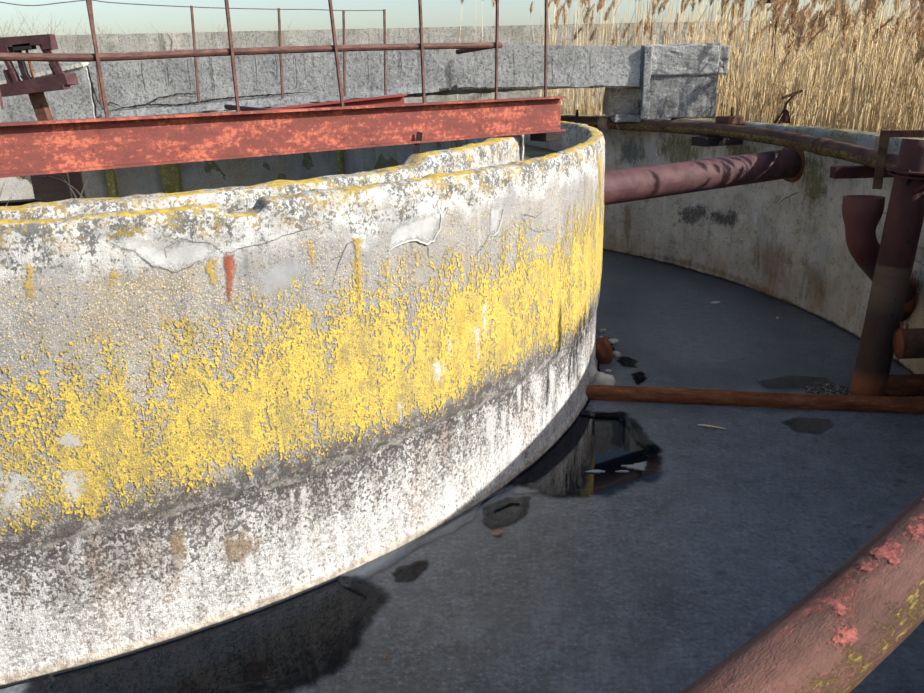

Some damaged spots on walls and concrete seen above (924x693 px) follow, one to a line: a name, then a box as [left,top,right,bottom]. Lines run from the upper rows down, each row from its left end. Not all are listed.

leakage [677,203,738,226]
crack [106,222,329,273]
rust [224,255,235,302]
leakage [57,431,84,447]
leakage [0,474,36,515]
leakage [59,470,88,502]
leakage [289,486,307,523]
leakage [226,528,261,562]